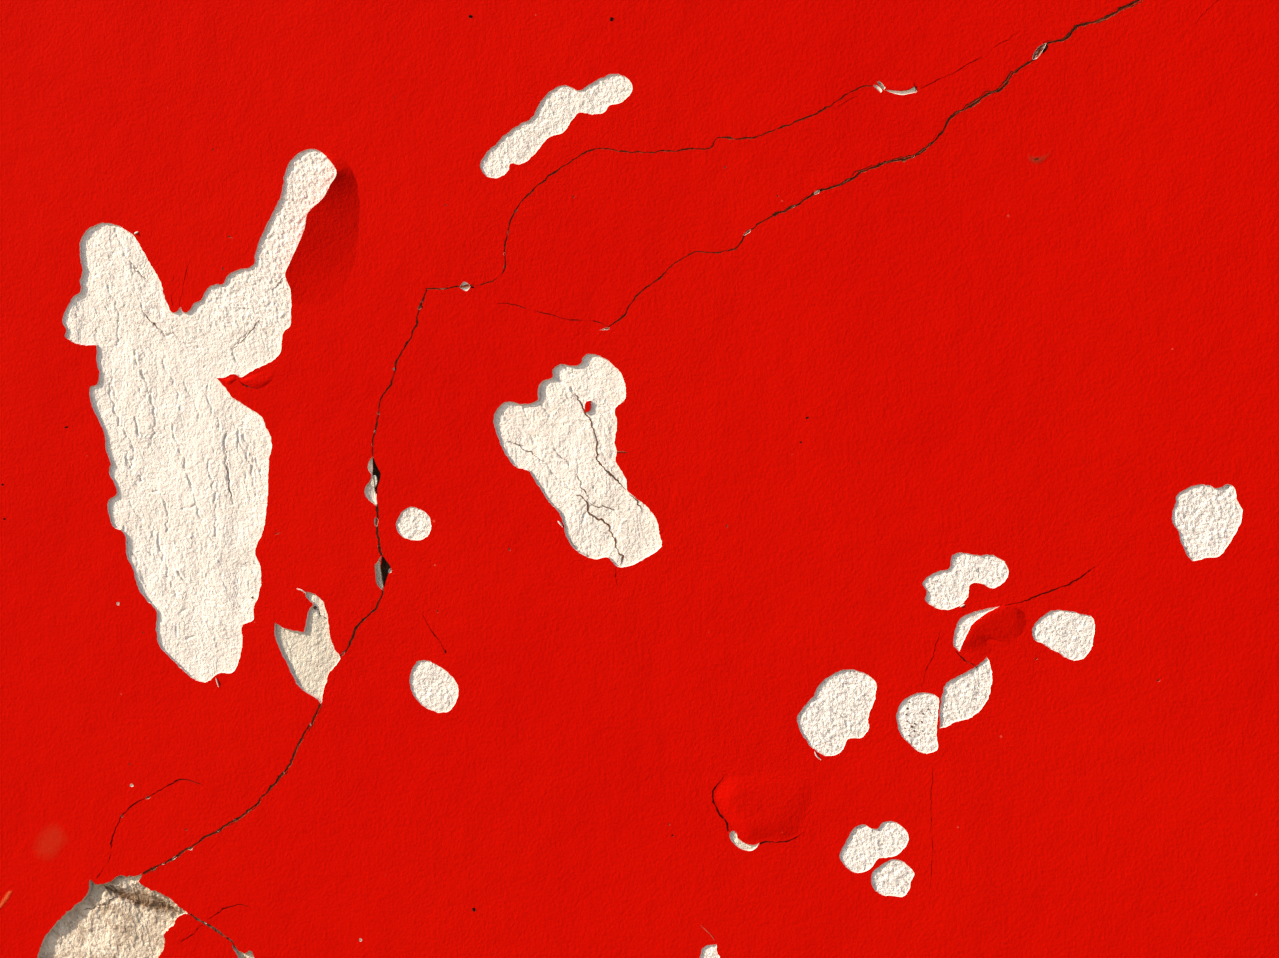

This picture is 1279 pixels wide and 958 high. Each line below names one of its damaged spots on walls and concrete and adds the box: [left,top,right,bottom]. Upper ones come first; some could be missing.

peeling [480,74,632,178]
crack [340,0,1143,656]
peeling [62,149,337,687]
peeling [493,354,662,568]
peeling [1172,484,1243,561]
peeling [797,669,877,760]
crack [96,779,202,879]
crack [143,703,323,874]
crack [712,774,729,831]
crack [760,832,804,845]
spalling [37,873,187,958]
crack [178,904,248,949]